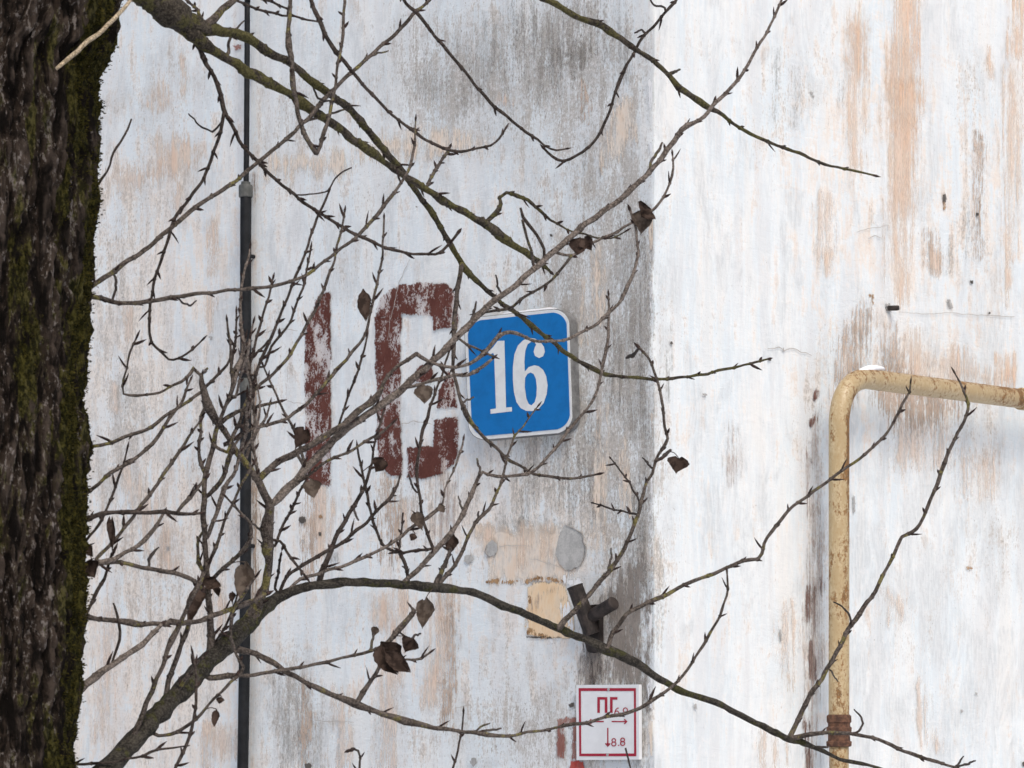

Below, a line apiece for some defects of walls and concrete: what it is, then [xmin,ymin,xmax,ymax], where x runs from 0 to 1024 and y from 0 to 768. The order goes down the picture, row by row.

peeling [599,98,637,172]
peeling [987,0,1024,204]
peeling [828,0,1019,399]
peeling [579,242,606,346]
peeling [871,391,995,500]
peeling [464,403,633,644]
corrosion [805,579,822,683]
corrosion [802,721,813,768]